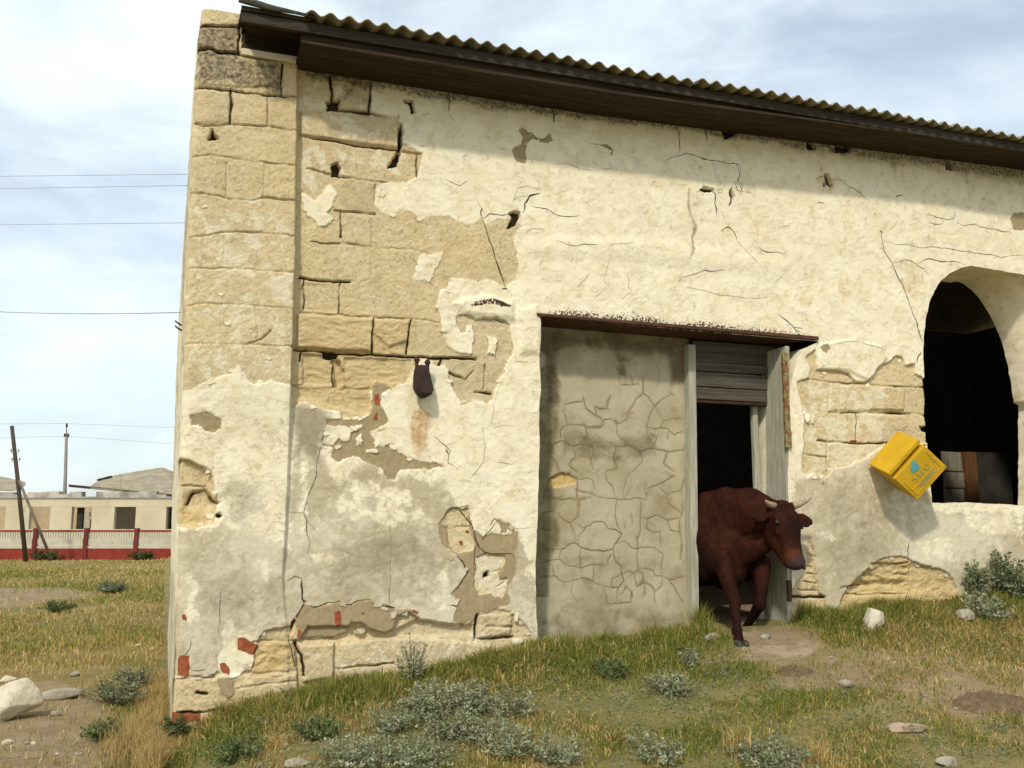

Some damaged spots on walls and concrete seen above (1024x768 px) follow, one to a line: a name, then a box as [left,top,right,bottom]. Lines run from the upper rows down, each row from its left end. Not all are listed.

spalling [183,9,522,483]
peeling [510,125,554,166]
crack [479,186,632,299]
crack [667,128,783,263]
crack [880,195,1018,362]
spalling [796,341,927,484]
spalling [178,455,221,532]
spalling [546,472,578,489]
crack [453,358,684,604]
crack [288,533,395,667]
spalling [172,504,534,736]
spalling [792,532,960,620]